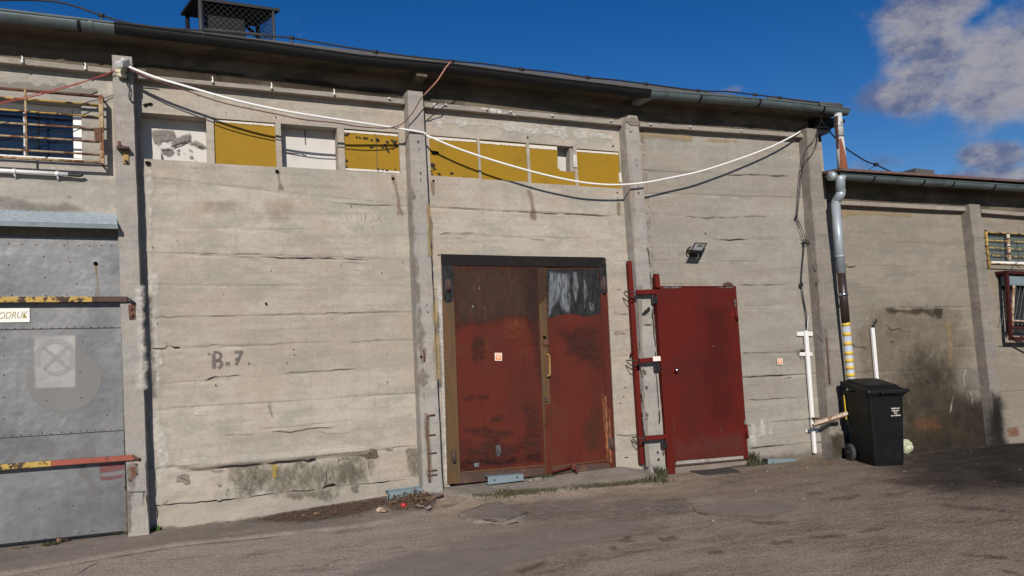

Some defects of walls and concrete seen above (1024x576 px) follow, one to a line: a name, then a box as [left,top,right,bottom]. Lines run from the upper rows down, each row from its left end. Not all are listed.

spalling [152,130,207,160]
spalling [359,448,393,459]